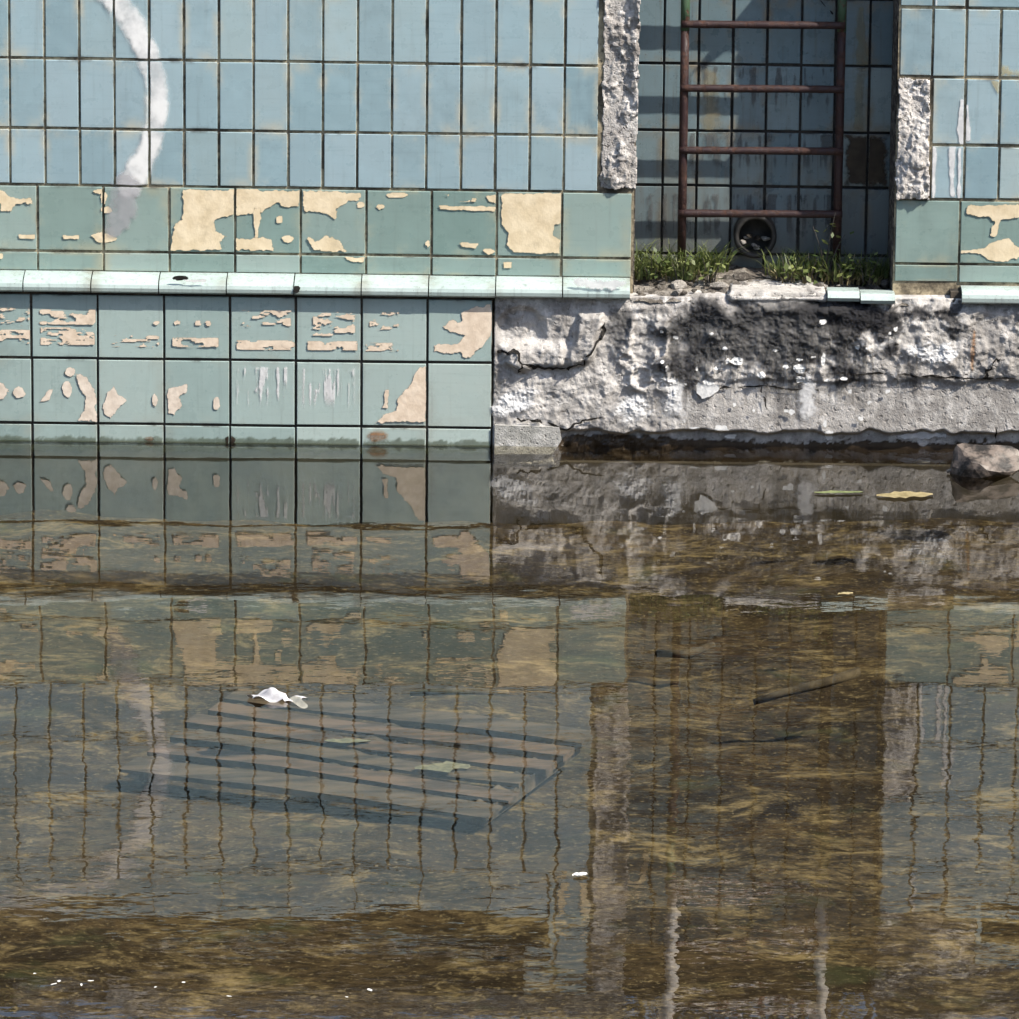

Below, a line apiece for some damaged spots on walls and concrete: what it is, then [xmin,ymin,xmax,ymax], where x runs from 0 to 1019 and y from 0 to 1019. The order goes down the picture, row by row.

spalling [599,0,641,190]
spalling [895,77,931,201]
peeling [171,189,408,251]
peeling [439,193,561,268]
peeling [961,204,1019,262]
peeling [0,308,96,345]
peeling [434,304,492,358]
crack [497,323,606,373]
peeling [377,366,426,424]
leakage [491,389,539,416]
crack [517,417,605,431]
leakage [553,293,1019,464]